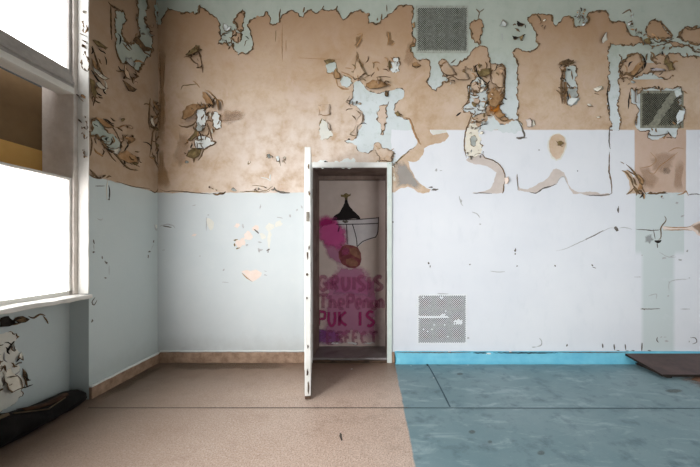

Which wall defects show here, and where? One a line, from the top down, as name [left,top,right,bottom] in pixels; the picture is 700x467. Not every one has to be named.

peeling [76,0,700,199]
peeling [234,206,303,252]
crack [558,130,666,251]
peeling [0,313,48,413]